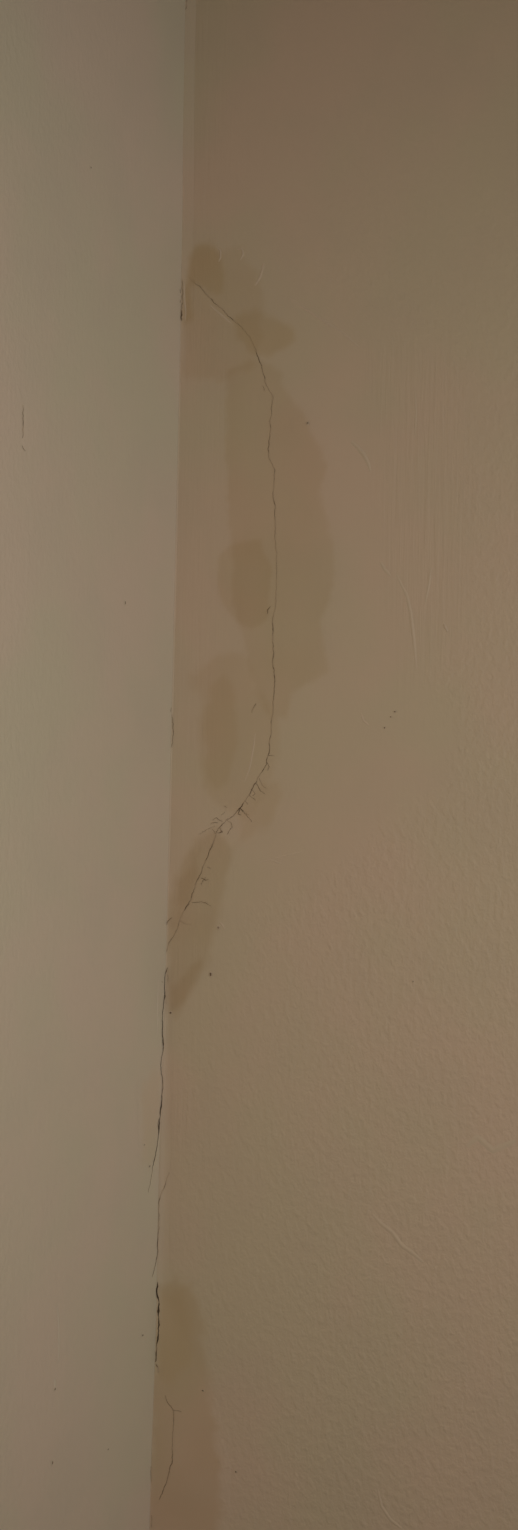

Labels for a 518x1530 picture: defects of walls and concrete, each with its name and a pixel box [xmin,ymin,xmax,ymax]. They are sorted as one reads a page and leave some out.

crack [148,278,277,1528]
damp [165,232,339,1027]
damp [150,1269,231,1530]